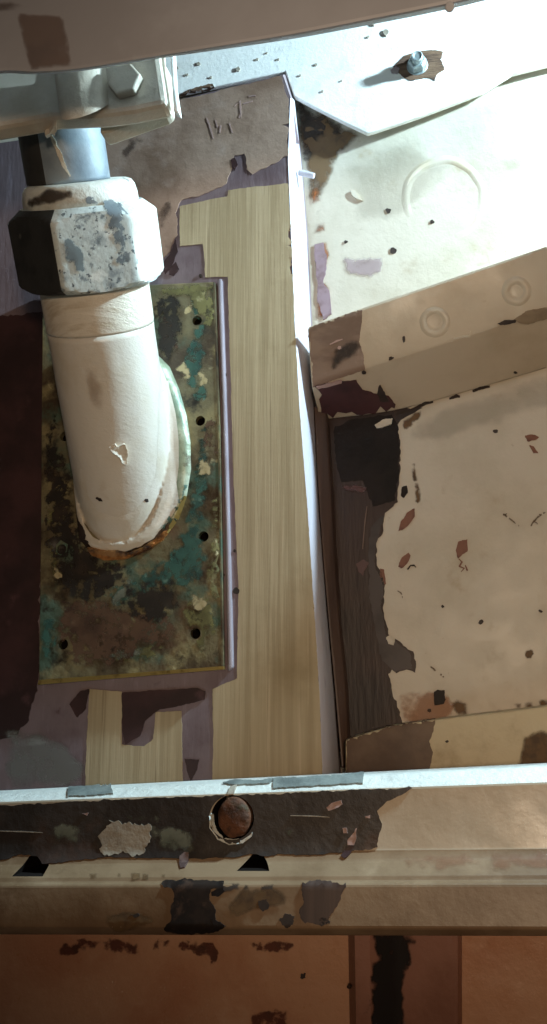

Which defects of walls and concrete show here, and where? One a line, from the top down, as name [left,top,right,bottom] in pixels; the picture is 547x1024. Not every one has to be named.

peeling [391,50,444,81]
peeling [0,183,421,935]
corrosion [60,939,136,955]
corrosion [154,940,218,963]
corrosion [253,941,293,952]
damp [371,935,415,1024]